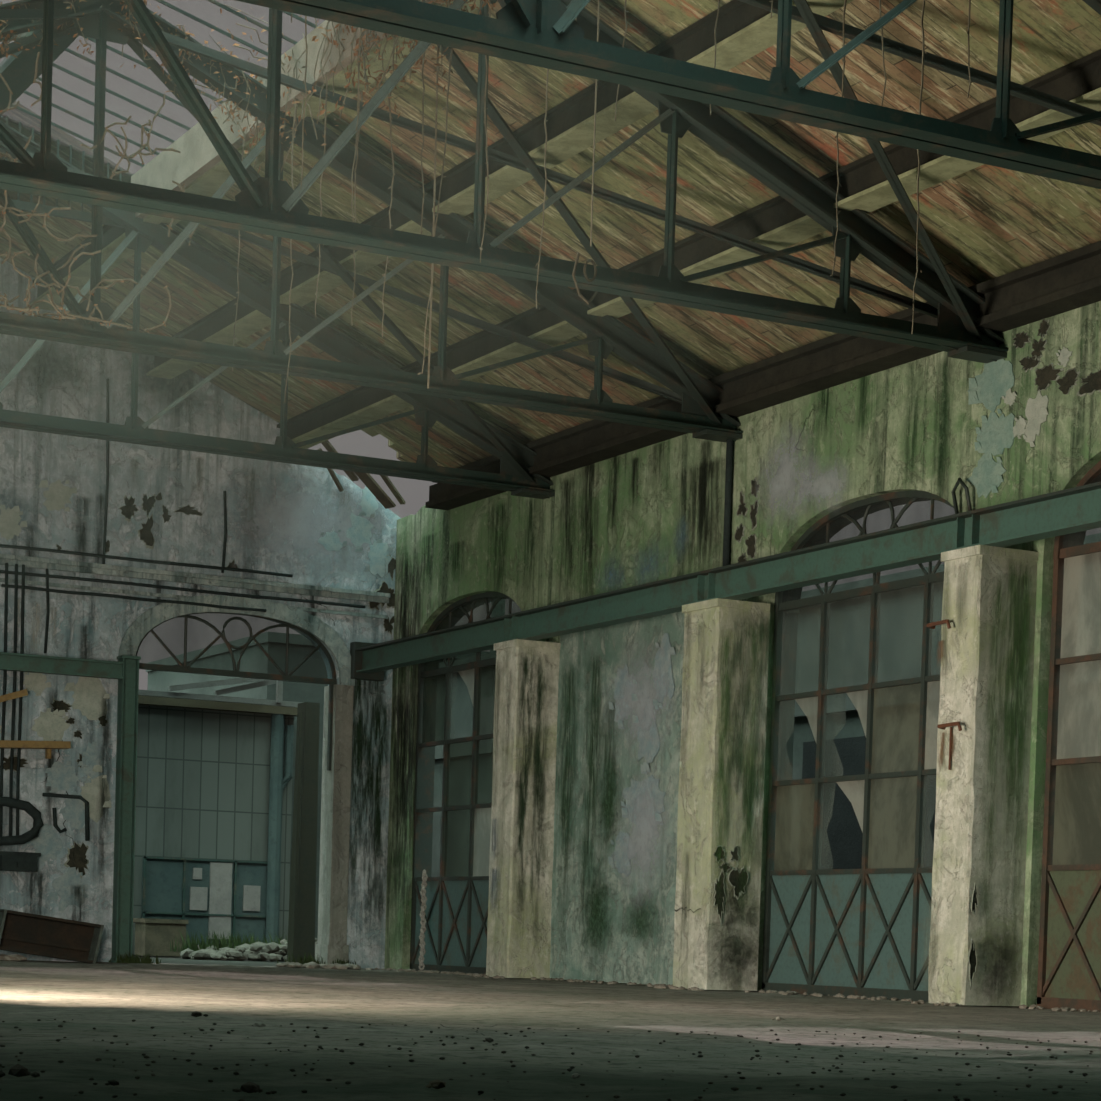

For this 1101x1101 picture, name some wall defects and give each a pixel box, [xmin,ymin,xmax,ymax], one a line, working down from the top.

flaking render [118,492,203,549]
water stain [396,535,434,639]
water stain [564,463,594,571]
water stain [677,442,718,551]
peeling [966,319,1101,498]
peeling [31,676,112,912]
water stain [349,665,419,903]
water stain [517,657,546,900]
water stain [561,663,661,873]
spalling [713,845,749,925]
water stain [718,620,773,842]
water stain [988,565,1030,837]